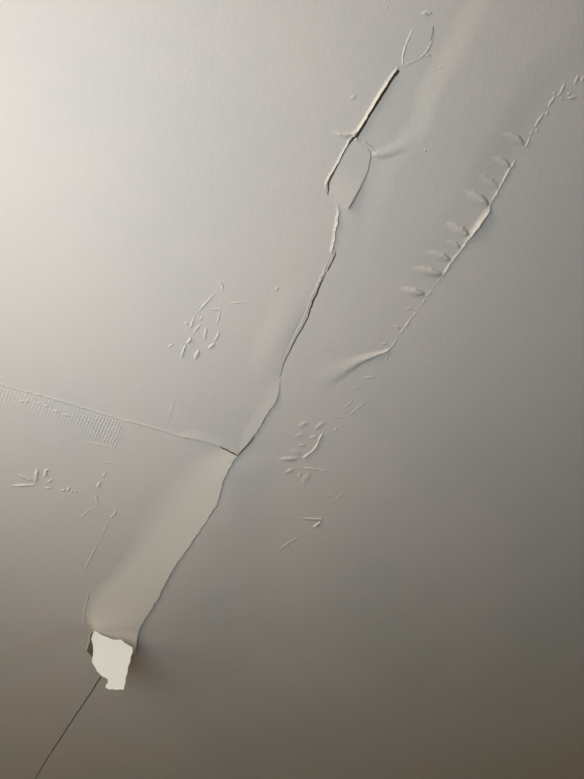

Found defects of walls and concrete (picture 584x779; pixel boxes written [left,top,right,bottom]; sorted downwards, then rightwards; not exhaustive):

crack [171,64,400,456]
crack [35,676,102,778]